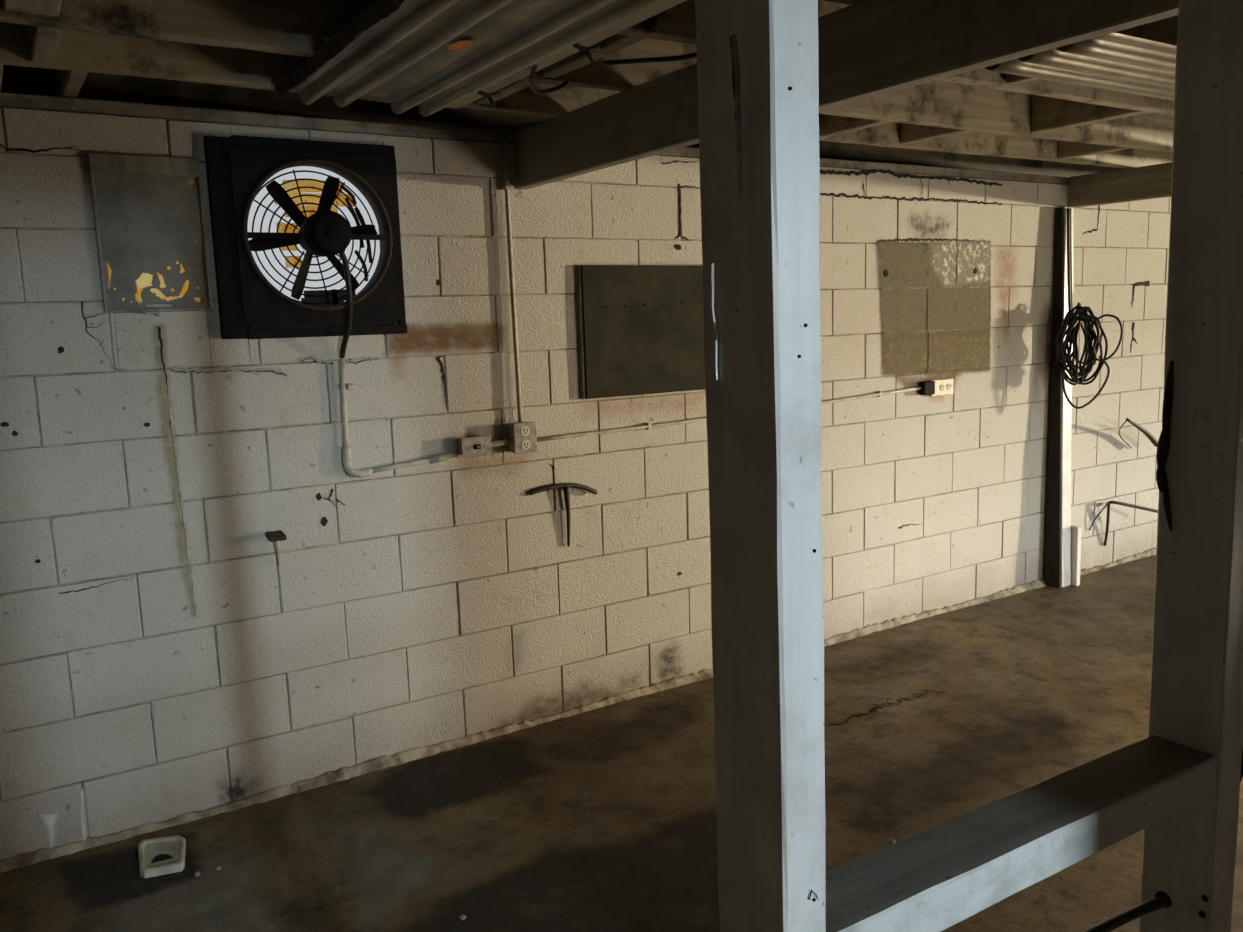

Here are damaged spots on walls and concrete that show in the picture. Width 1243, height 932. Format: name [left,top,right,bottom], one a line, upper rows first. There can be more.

crack [0,144,79,153]
crack [820,169,1002,205]
crack [81,301,128,371]
corrosion [390,324,502,351]
crack [829,690,947,726]